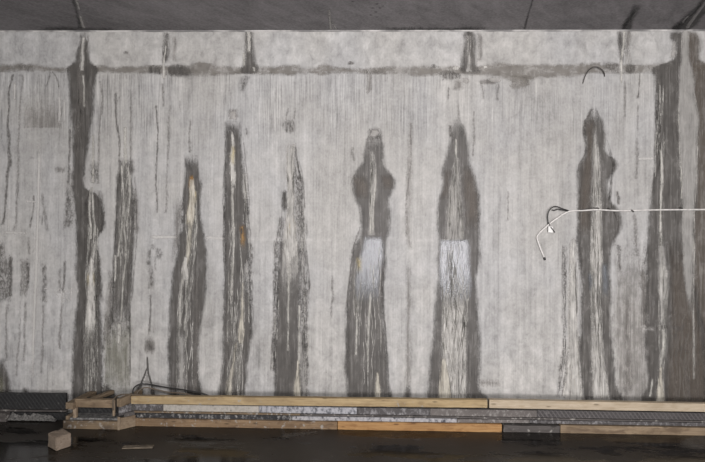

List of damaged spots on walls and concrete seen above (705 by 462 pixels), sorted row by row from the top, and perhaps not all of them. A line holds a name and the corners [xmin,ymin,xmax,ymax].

leakage [0,0,353,399]
leakage [345,129,395,397]
leakage [408,0,705,405]